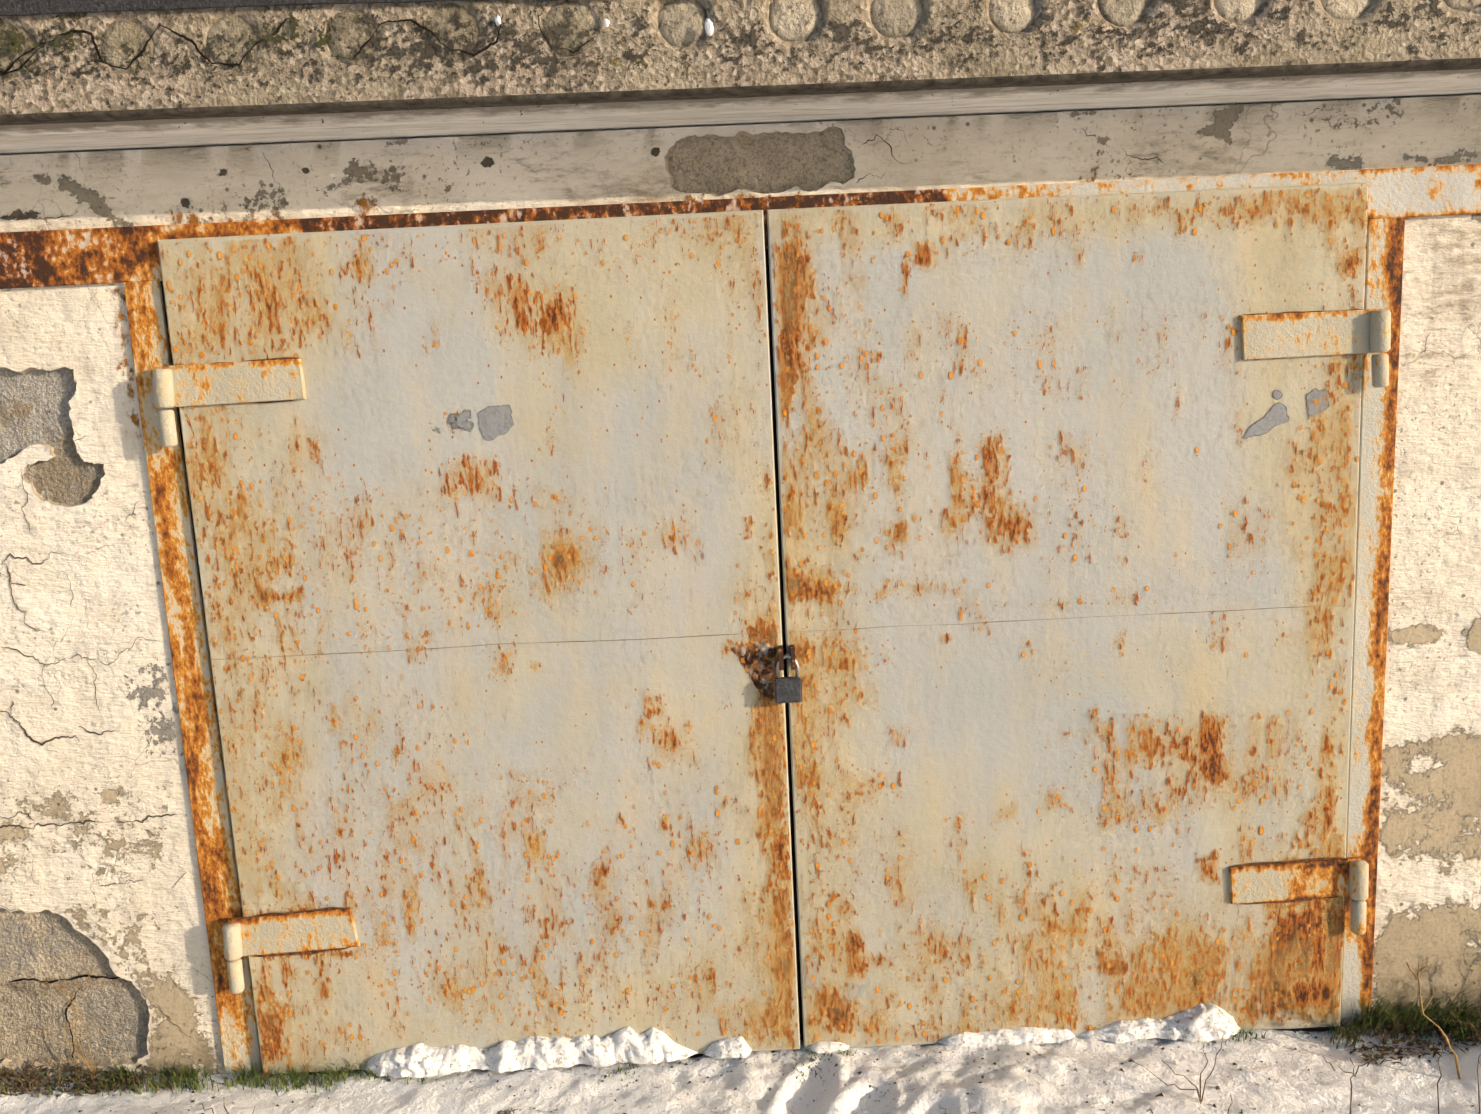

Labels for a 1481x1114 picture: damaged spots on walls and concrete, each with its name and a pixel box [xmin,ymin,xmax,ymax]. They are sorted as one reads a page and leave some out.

crack [0,213,68,221]
peeling [480,156,494,168]
spalling [651,120,856,197]
spalling [0,367,105,507]
corrosion [114,288,141,438]
crack [0,471,160,746]
corrosion [161,168,1368,1074]
crack [0,812,177,1063]
spalling [0,758,224,1075]
peeling [1372,725,1481,1017]